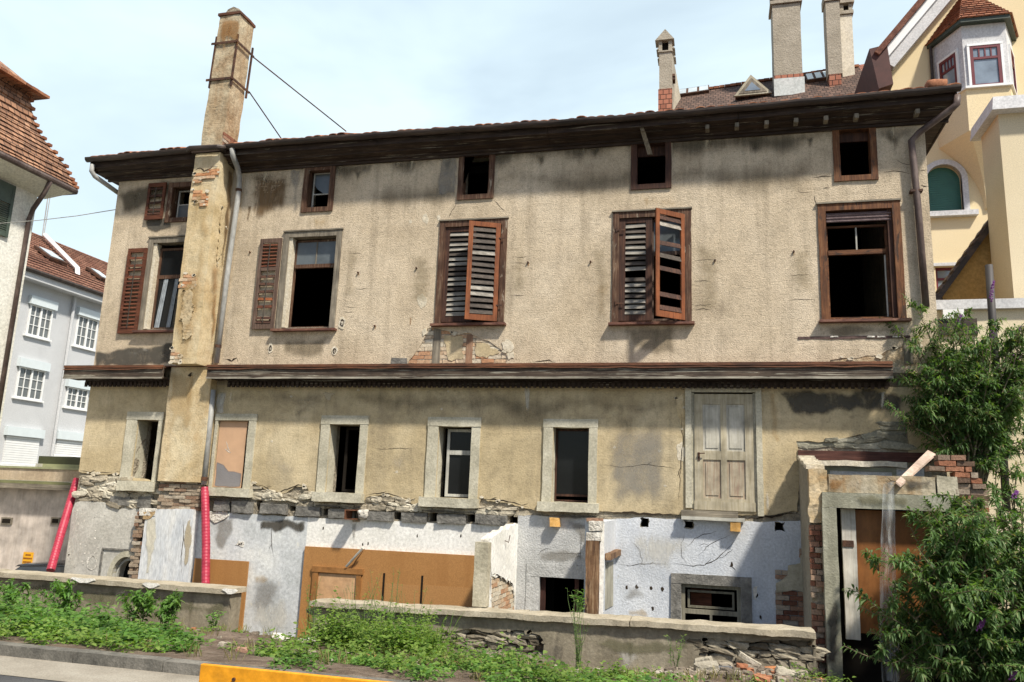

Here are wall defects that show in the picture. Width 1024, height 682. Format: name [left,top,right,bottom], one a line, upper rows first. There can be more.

flaking render [190,166,220,207]
flaking render [168,272,197,377]
flaking render [391,328,515,364]
spalling [128,511,155,579]
crack [600,424,733,568]
spalling [687,570,830,678]